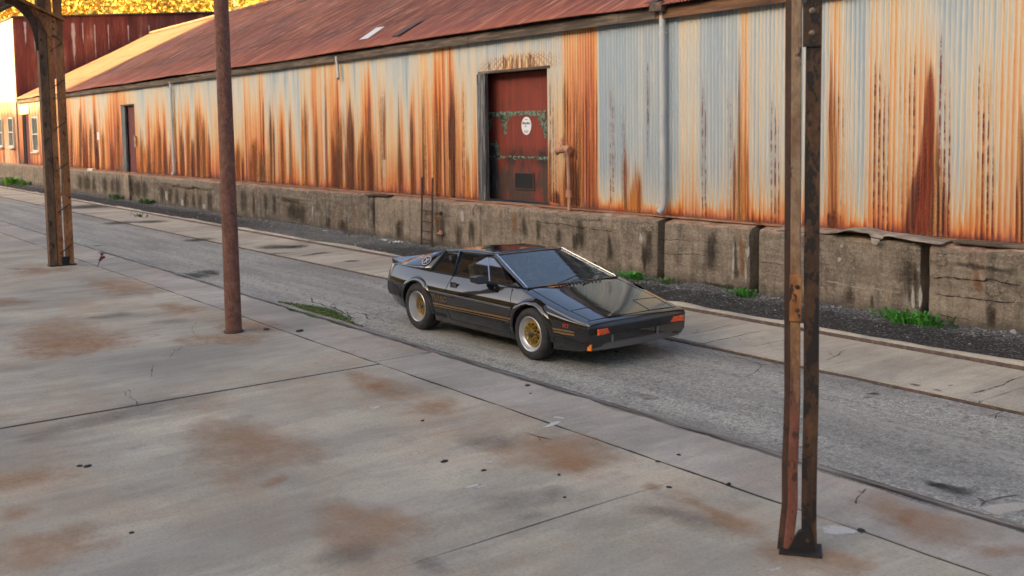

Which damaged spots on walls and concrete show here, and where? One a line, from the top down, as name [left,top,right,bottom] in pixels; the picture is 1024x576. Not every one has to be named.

rust [70,115,120,170]
rust [140,114,211,178]
rust [236,97,470,198]
rust [873,74,889,231]
rust [901,38,950,236]
rust [977,68,994,236]
leakage [78,177,147,197]
leakage [261,245,325,256]
leakage [636,231,652,268]
leakage [706,243,749,289]
leakage [905,261,922,307]
crack [933,277,1021,322]